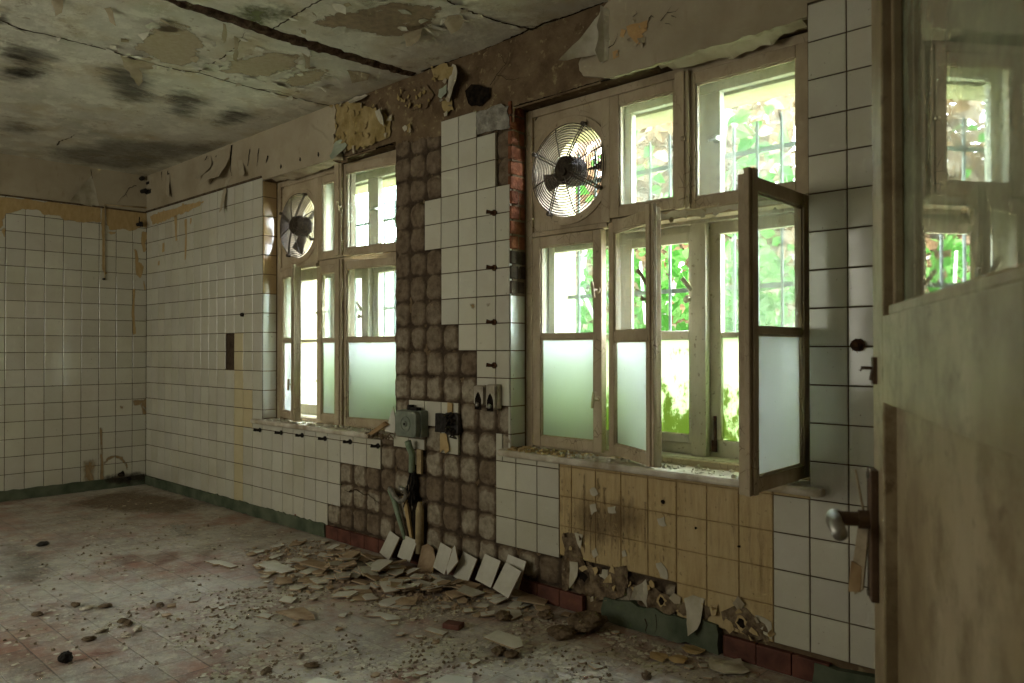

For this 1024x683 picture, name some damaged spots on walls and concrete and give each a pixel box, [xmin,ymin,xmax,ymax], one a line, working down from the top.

mould [4,48,47,79]
mould [106,69,148,101]
peeling [659,19,807,70]
peeling [104,0,775,642]